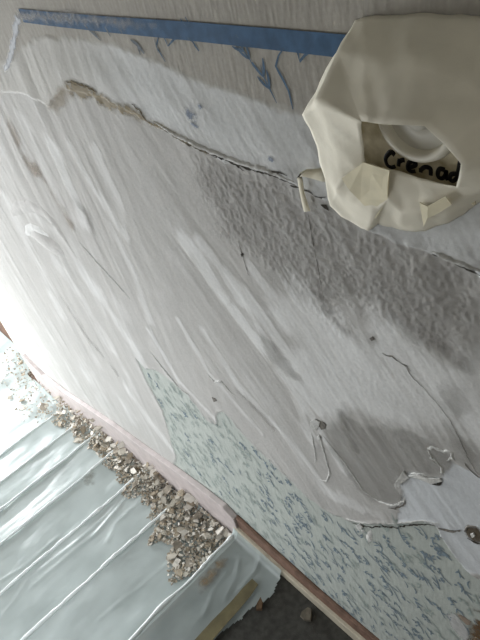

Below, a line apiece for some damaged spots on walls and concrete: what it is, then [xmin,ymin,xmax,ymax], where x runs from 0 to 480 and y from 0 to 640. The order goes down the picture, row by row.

crack [149,119,329,301]
crack [431,251,480,276]
crack [382,353,480,478]
spalling [310,419,326,440]
peeling [394,446,455,488]
peeling [371,497,406,510]
peeling [346,518,480,544]